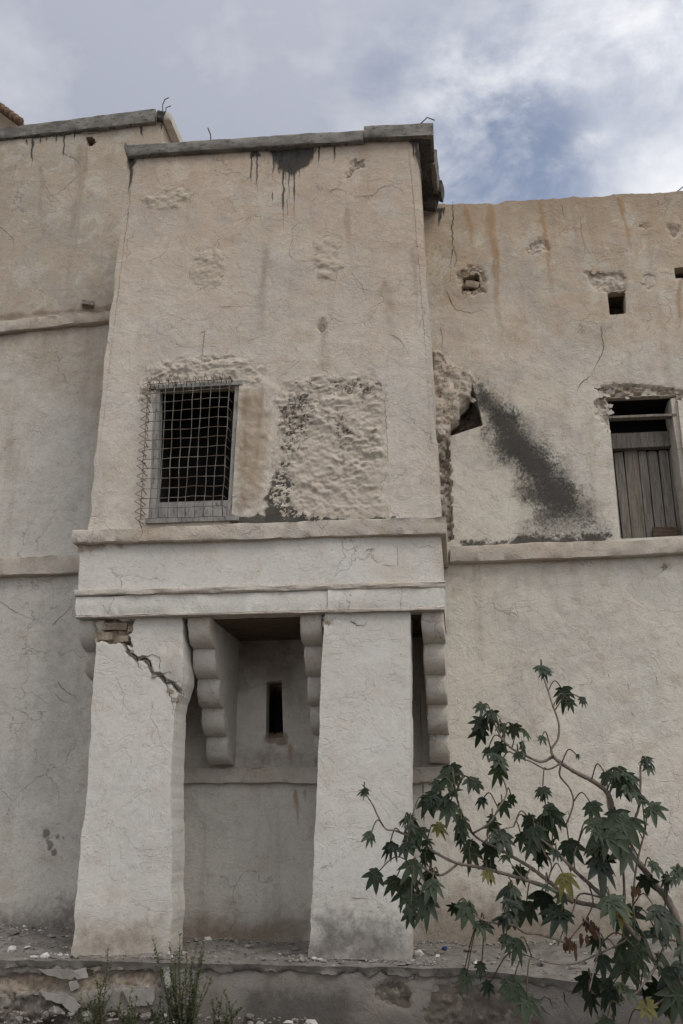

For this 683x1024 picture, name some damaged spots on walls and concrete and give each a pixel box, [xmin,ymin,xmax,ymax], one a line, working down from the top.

leakage [250,147,320,213]
spalling [592,383,683,432]
spalling [433,351,477,540]
leakage [460,532,612,546]
crack [117,646,184,742]